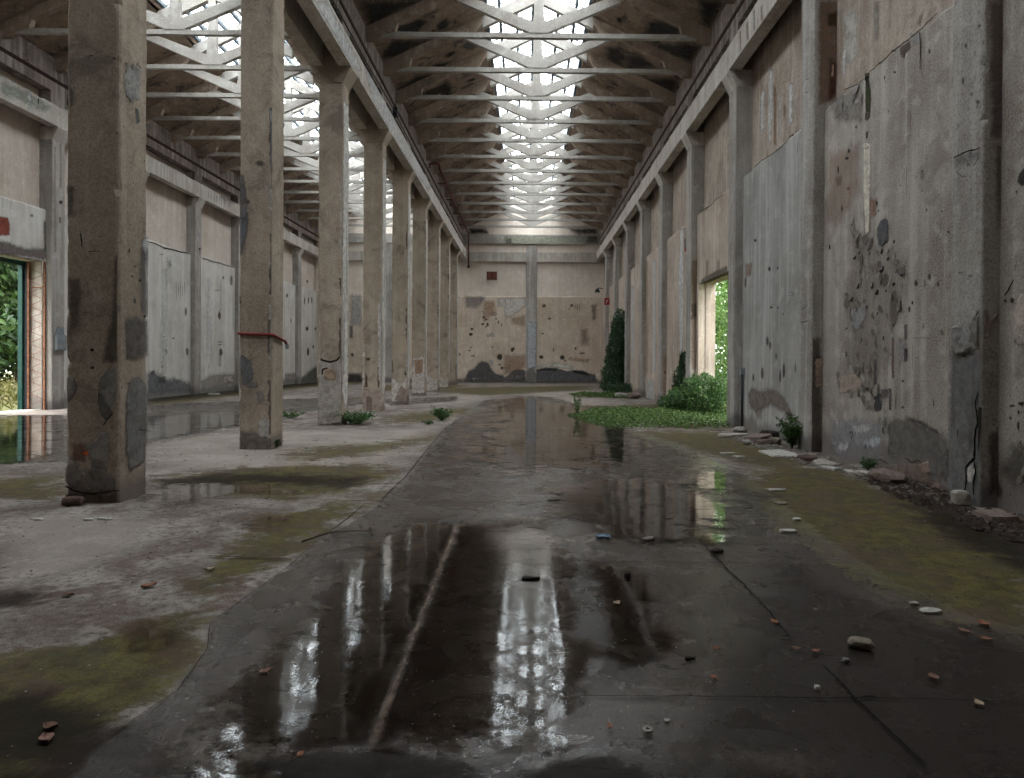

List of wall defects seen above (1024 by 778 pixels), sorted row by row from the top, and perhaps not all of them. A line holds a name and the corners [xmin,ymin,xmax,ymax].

damp [990,3,1003,201]
damp [464,322,596,383]
damp [749,337,796,417]
peeling [836,224,913,409]
damp [874,325,1024,503]
crack [964,392,982,495]